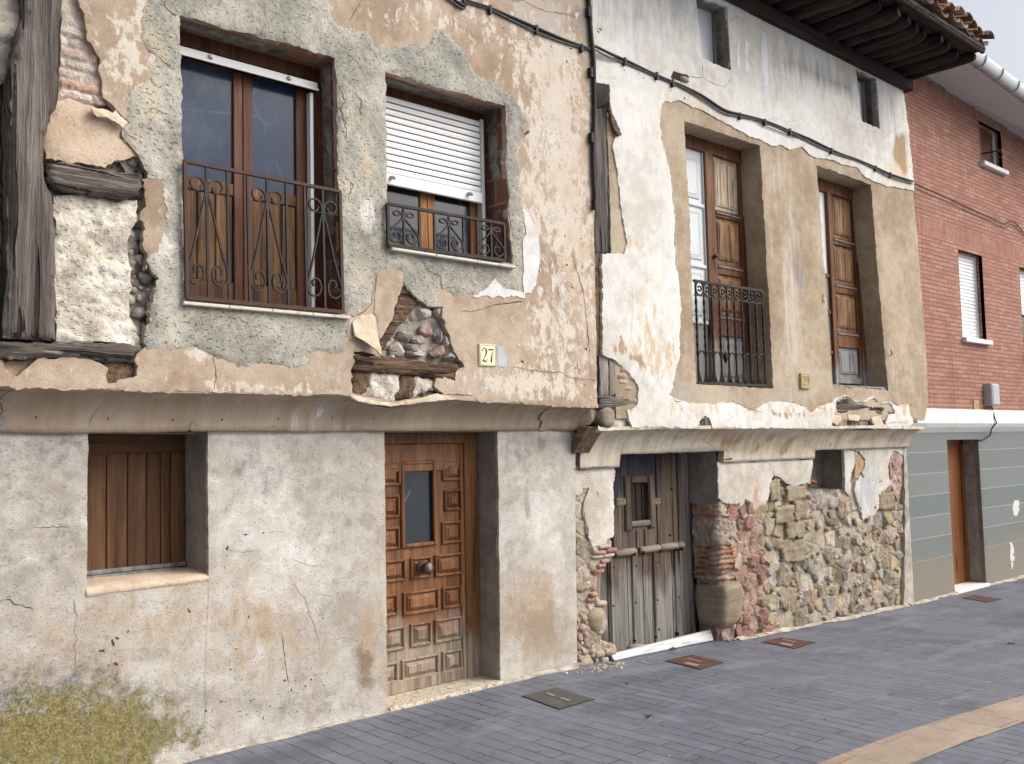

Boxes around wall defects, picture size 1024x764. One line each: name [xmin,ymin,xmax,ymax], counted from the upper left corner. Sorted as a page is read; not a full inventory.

flaking render [0,0,156,383]
flaking render [343,269,461,419]
flaking render [548,84,647,453]
flaking render [832,398,894,430]
leakage [894,135,906,172]
crack [289,558,352,649]
flaking render [575,488,618,666]
flaking render [691,449,904,641]